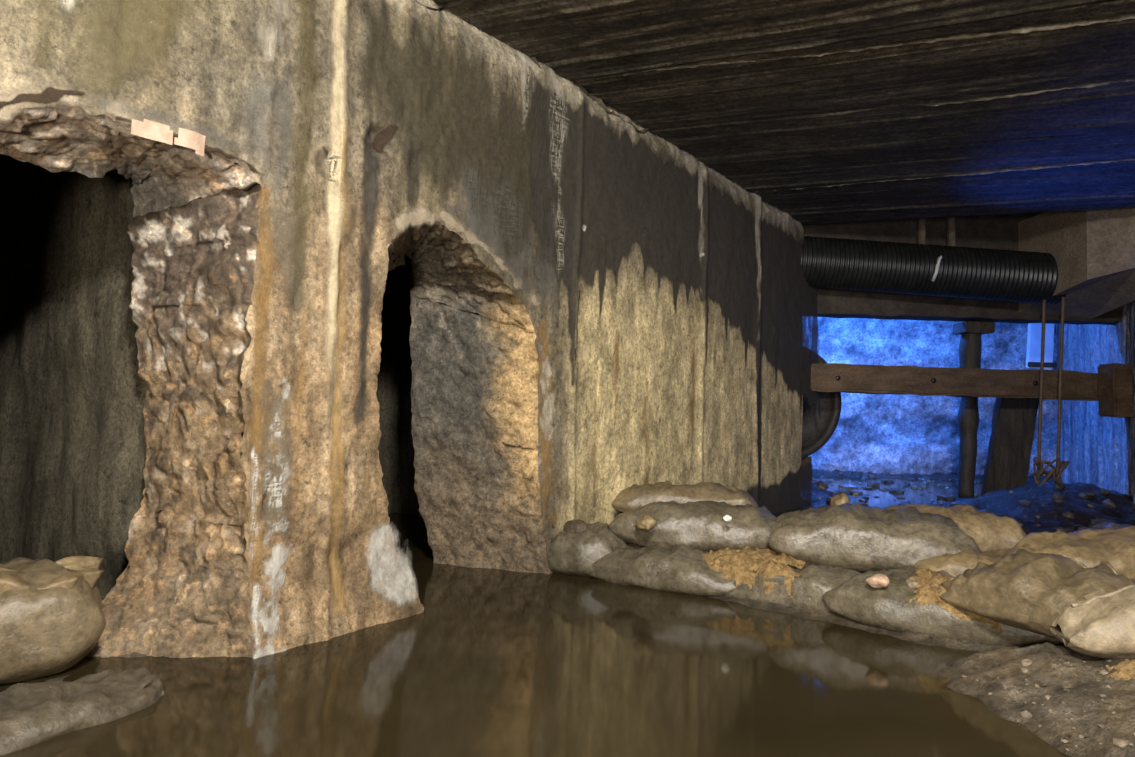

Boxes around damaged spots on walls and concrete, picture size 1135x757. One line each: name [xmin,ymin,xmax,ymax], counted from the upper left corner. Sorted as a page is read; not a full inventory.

spalling [0,86,84,120]
leakage [87,0,190,83]
leakage [300,0,314,165]
leakage [623,17,1135,76]
leakage [294,186,309,302]
leakage [325,0,347,498]
leakage [356,132,379,420]
leakage [361,3,821,514]
efflorescence [251,449,289,529]
efflorescence [252,520,288,659]
leakage [330,542,345,611]
efflorescence [369,526,415,604]